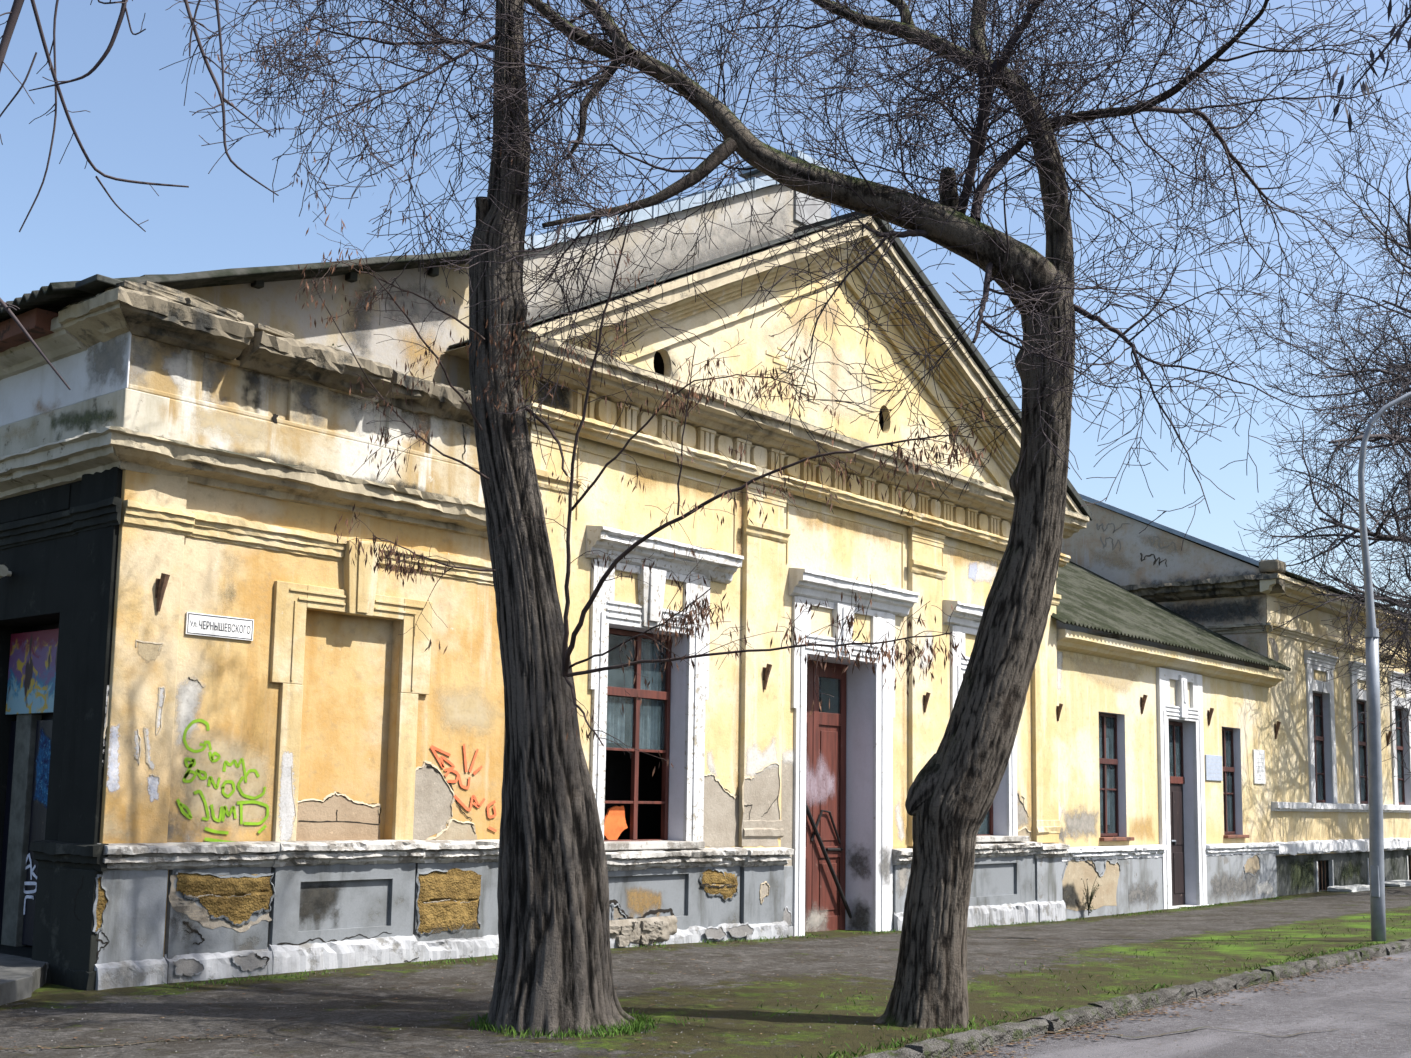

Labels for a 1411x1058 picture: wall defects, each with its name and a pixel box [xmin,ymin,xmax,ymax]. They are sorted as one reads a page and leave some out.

water stain [200,373,293,464]
flaking render [278,751,381,841]
peeling [413,761,477,840]
peeling [703,749,794,866]
flaking render [169,870,276,932]
flaking render [415,868,482,936]
flaking render [610,903,627,920]
flaking render [699,868,738,902]
peeling [1062,857,1120,911]